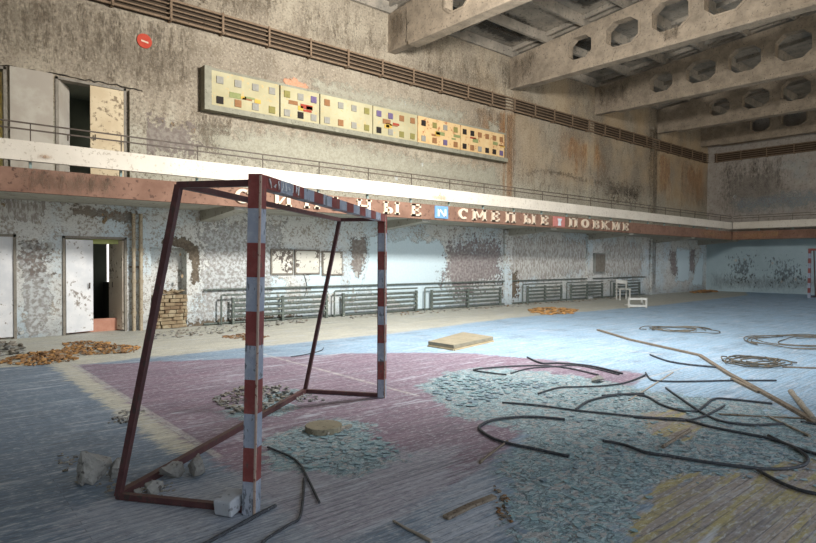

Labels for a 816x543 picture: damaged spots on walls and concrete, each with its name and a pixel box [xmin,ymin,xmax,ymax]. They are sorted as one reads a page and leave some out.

peeling [17,240,57,336]
peeling [161,219,247,327]
peeling [264,219,305,321]
peeling [307,230,586,311]